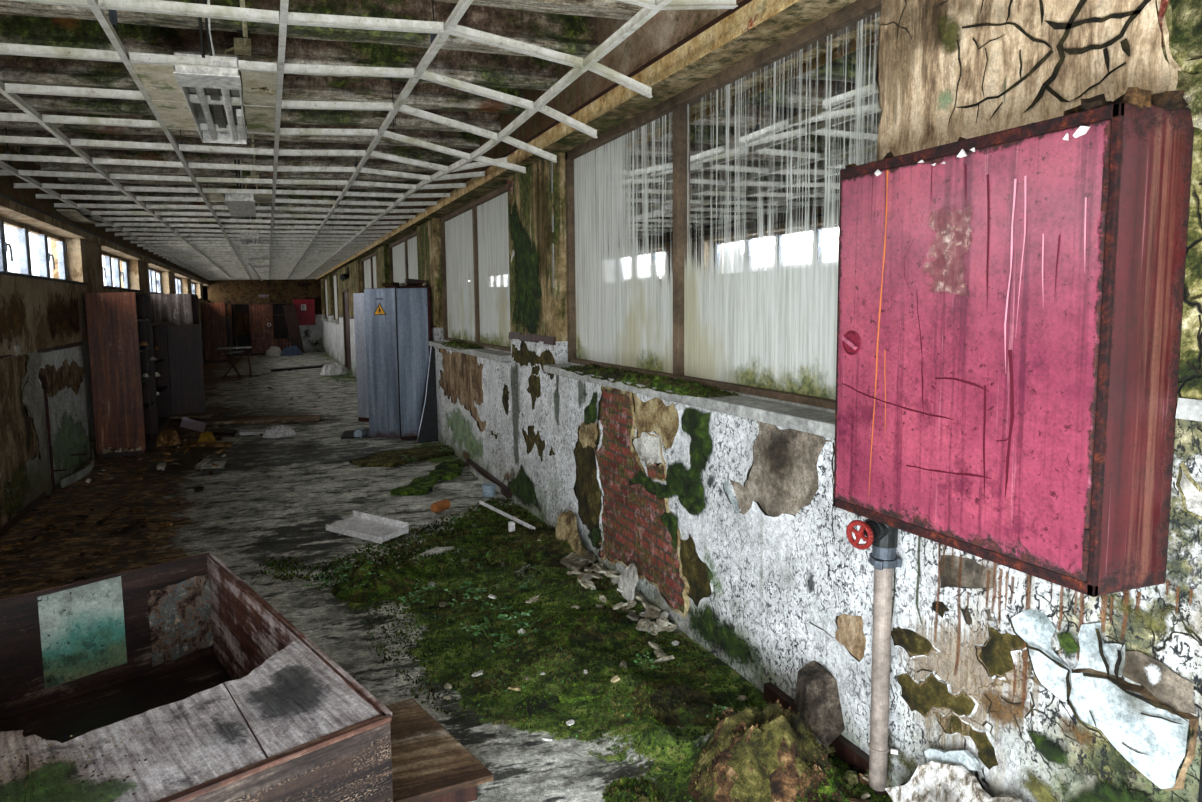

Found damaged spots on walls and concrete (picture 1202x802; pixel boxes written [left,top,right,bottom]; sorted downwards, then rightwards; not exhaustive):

crack [880,0,948,50]
crack [948,0,1151,127]
peeling [0,340,85,527]
peeling [436,348,498,441]
peeling [502,382,511,418]
peeling [511,341,557,466]
flaking render [573,385,715,618]
peeling [723,421,835,521]
corrosion [934,544,969,676]
corrosion [982,558,1031,623]
corrosion [1012,642,1028,708]